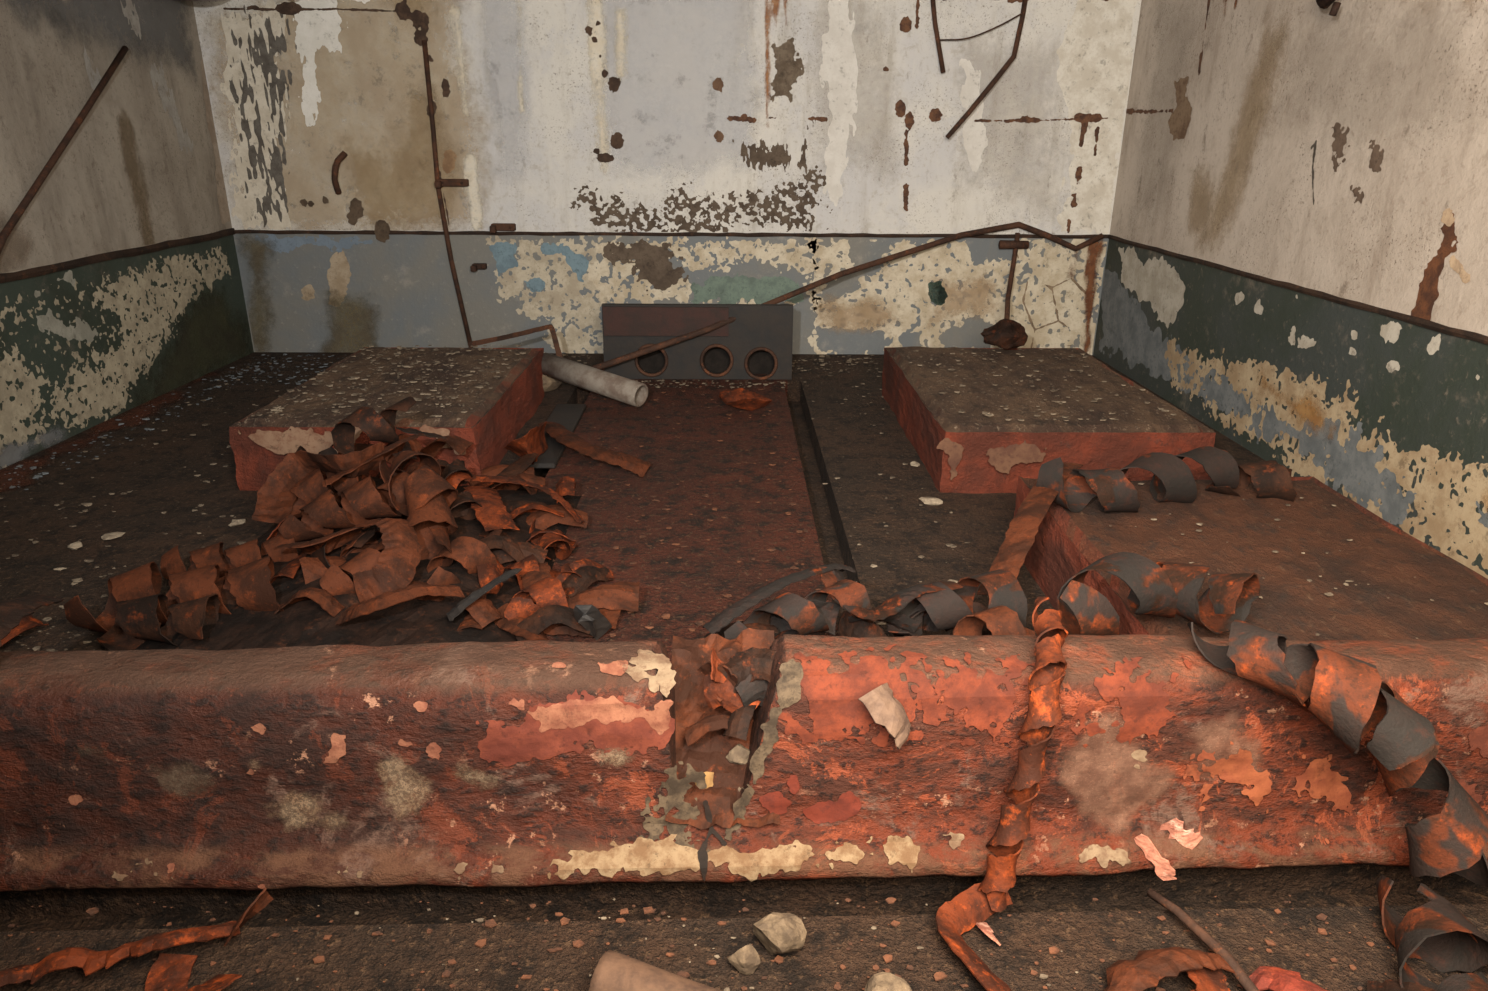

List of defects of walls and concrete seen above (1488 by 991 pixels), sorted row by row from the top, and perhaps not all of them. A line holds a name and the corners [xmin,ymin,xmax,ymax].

rust [727,0,787,123]
peeling [486,0,1488,579]
rust [1411,213,1458,321]
rust [573,605,612,640]
rust [1417,883,1478,943]